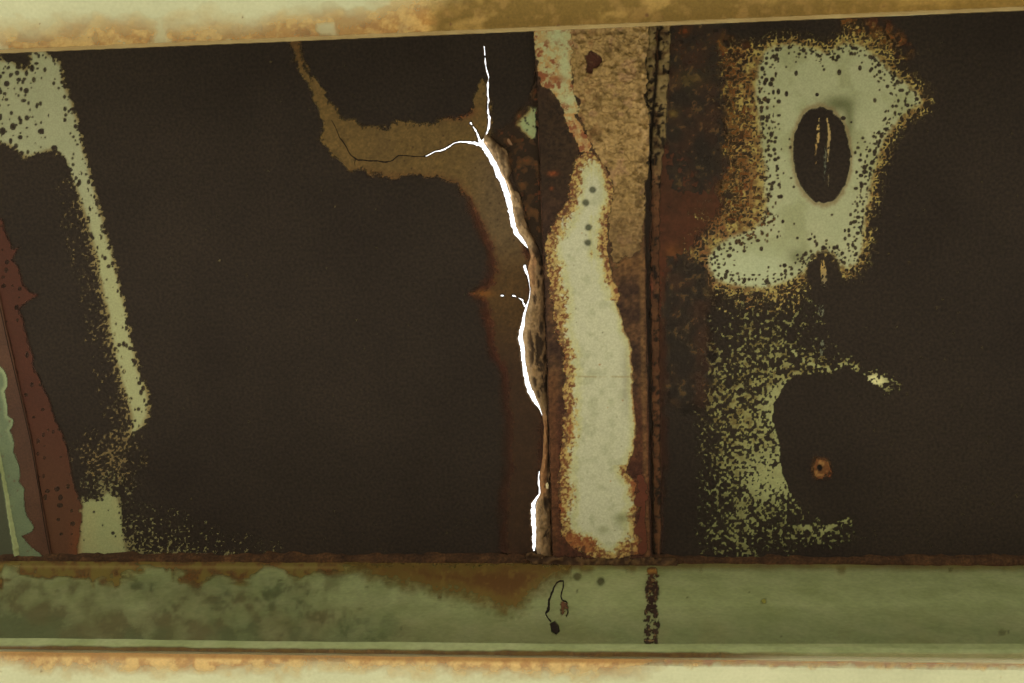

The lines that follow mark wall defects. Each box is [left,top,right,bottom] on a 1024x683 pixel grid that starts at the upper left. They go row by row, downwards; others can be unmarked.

rust [0,220,603,614]
crack [331,46,542,415]
rust [289,41,593,559]
rust [0,0,1024,53]
rust [0,567,1024,673]
peeling [516,107,536,139]
crack [529,472,539,550]
rust [607,38,775,569]
peeling [683,22,933,557]
rust [812,458,832,479]